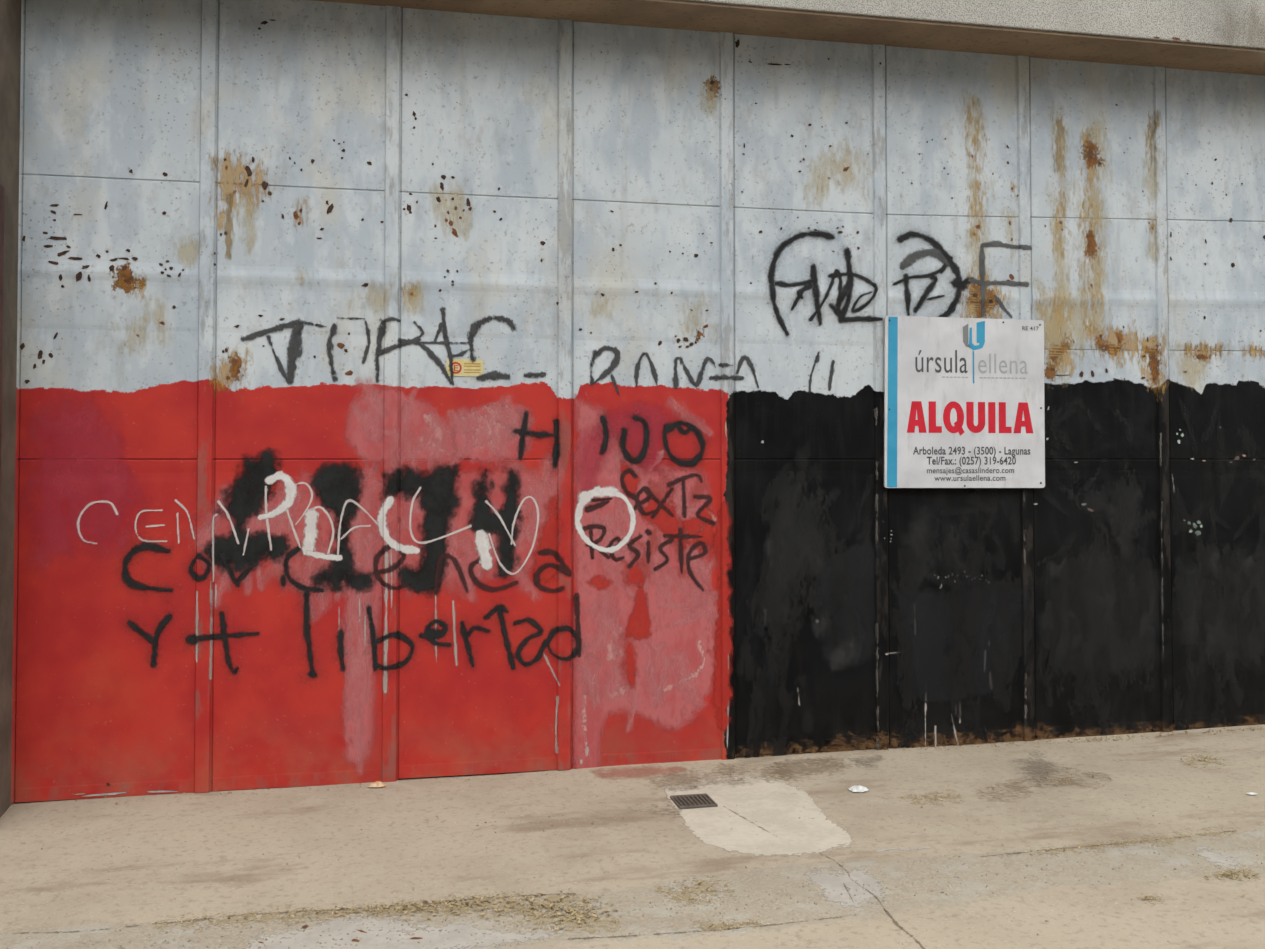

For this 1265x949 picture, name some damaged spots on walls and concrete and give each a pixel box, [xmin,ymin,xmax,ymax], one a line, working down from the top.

rust [1055,118,1065,171]
rust [1148,112,1159,163]
rust [213,156,272,266]
rust [434,186,472,239]
rust [970,182,983,240]
rust [112,262,145,293]
rust [1039,134,1165,388]
rust [213,350,248,388]
rust [1185,342,1222,361]
crack [826,856,924,949]